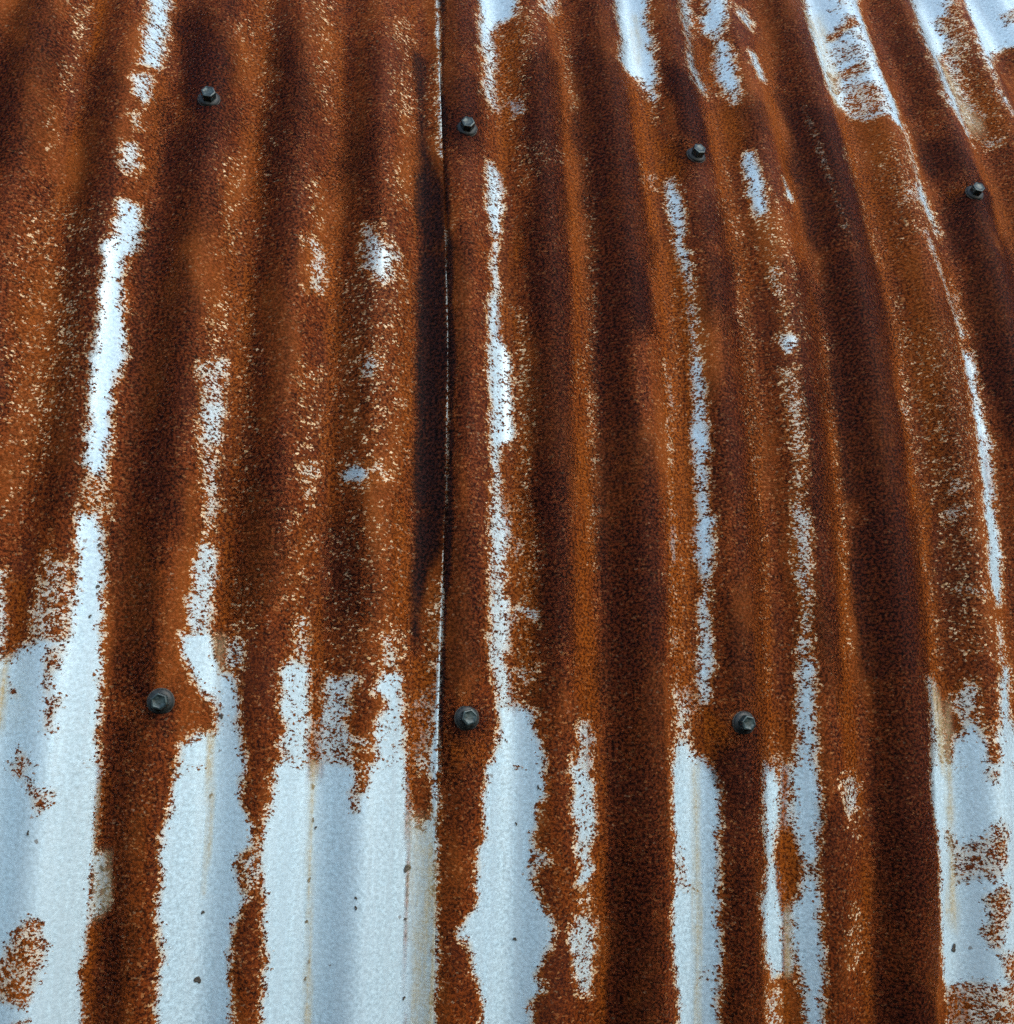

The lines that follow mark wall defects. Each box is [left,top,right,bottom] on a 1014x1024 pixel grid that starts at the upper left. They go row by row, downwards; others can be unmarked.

rust [748,0,1014,1024]
rust [0,668,16,707]
rust [86,860,99,912]
rust [0,913,54,1024]